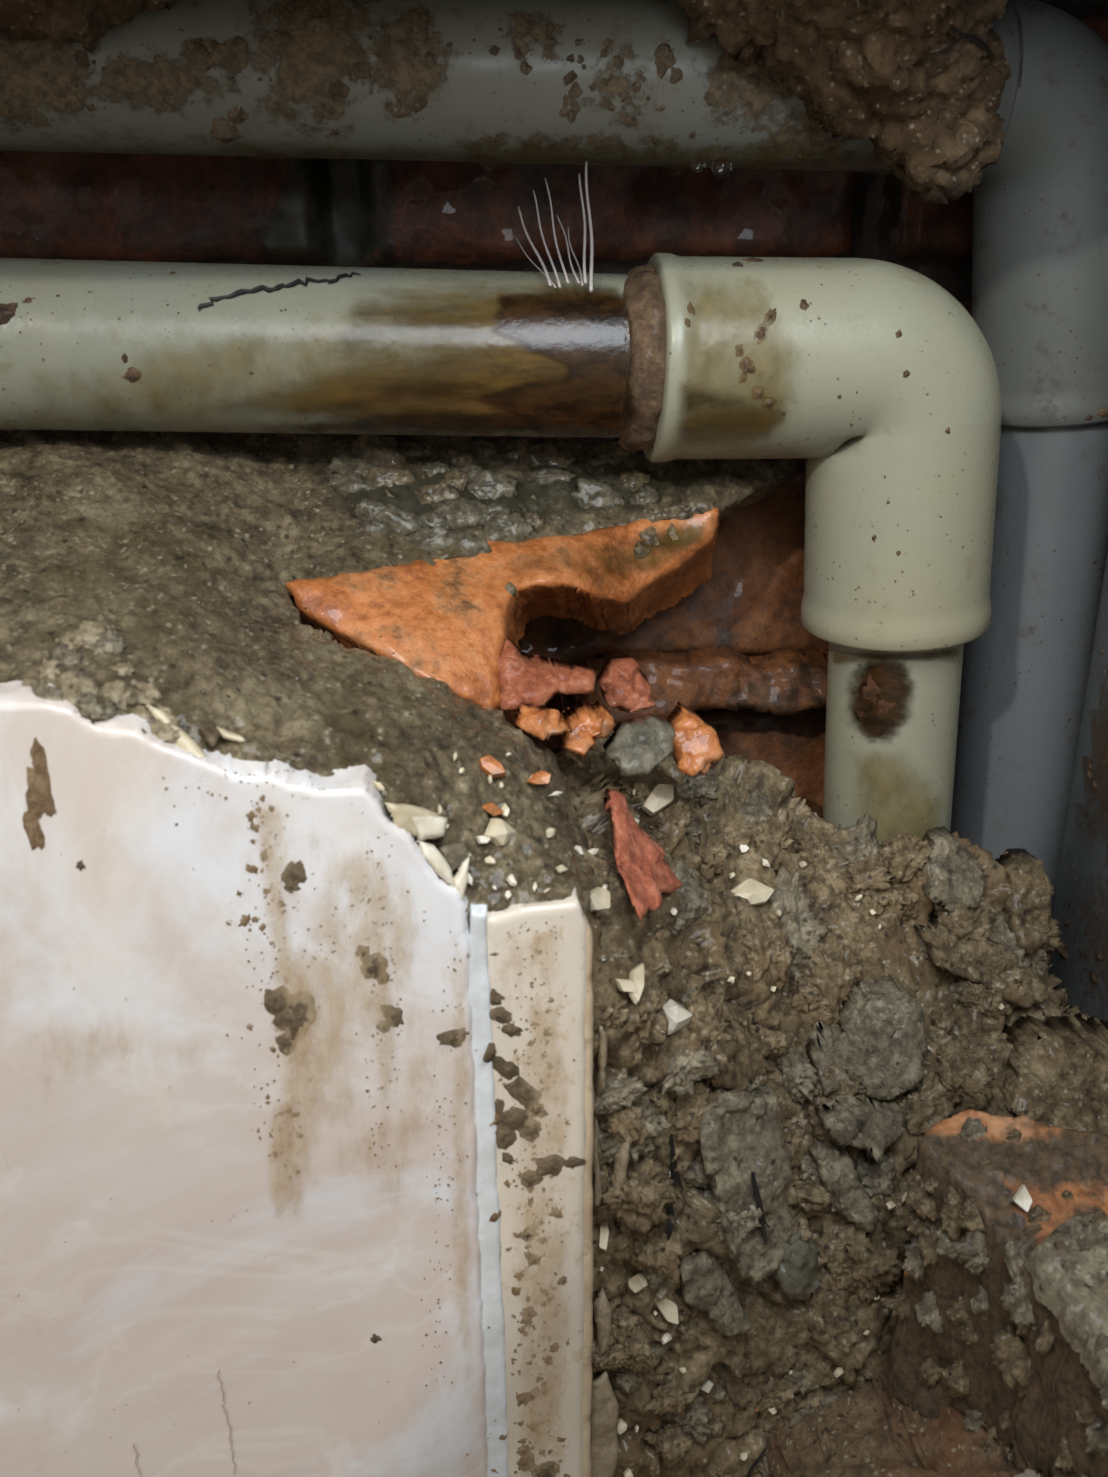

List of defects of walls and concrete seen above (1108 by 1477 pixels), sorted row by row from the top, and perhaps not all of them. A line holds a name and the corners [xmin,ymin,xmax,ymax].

rust [280,286,633,438]
spalling [286,508,719,728]
rust [834,651,951,738]
spalling [141,702,246,757]
spalling [373,751,568,901]
peeling [641,784,674,816]
peeling [590,884,610,911]
peeling [616,963,644,1004]
peeling [663,999,692,1035]
peeling [1012,1184,1032,1212]
peeling [628,1272,679,1324]
peeling [590,1286,619,1477]